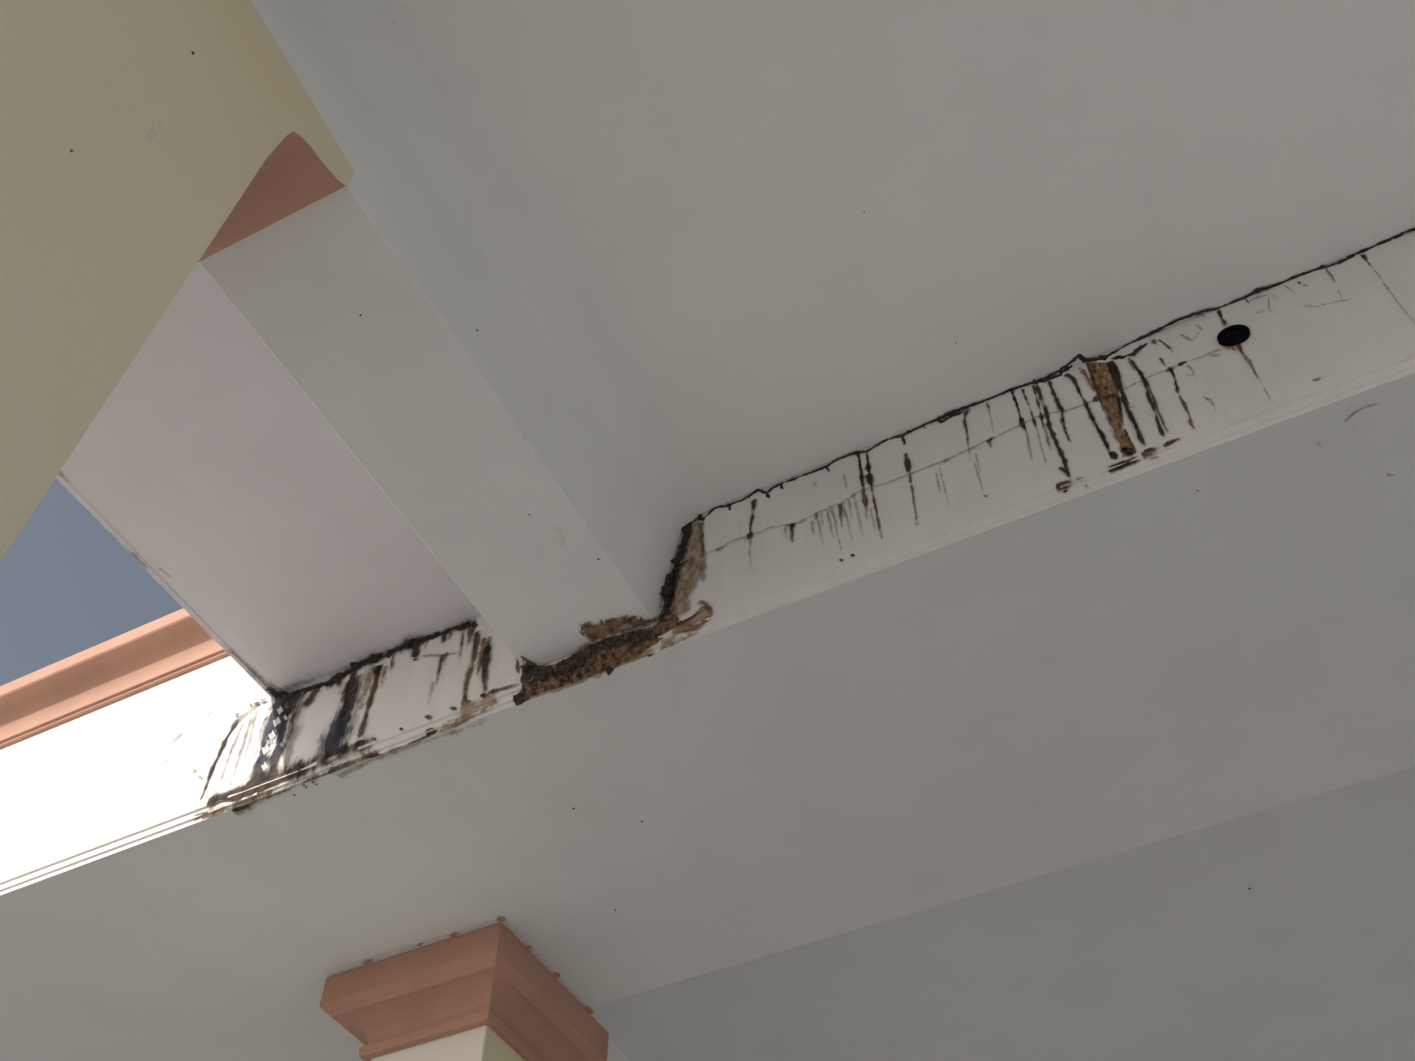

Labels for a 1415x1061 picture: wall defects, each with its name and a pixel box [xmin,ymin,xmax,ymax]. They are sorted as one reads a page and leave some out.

crack [655,228,1415,622]
crack [266,619,479,701]
spalling [513,612,703,706]